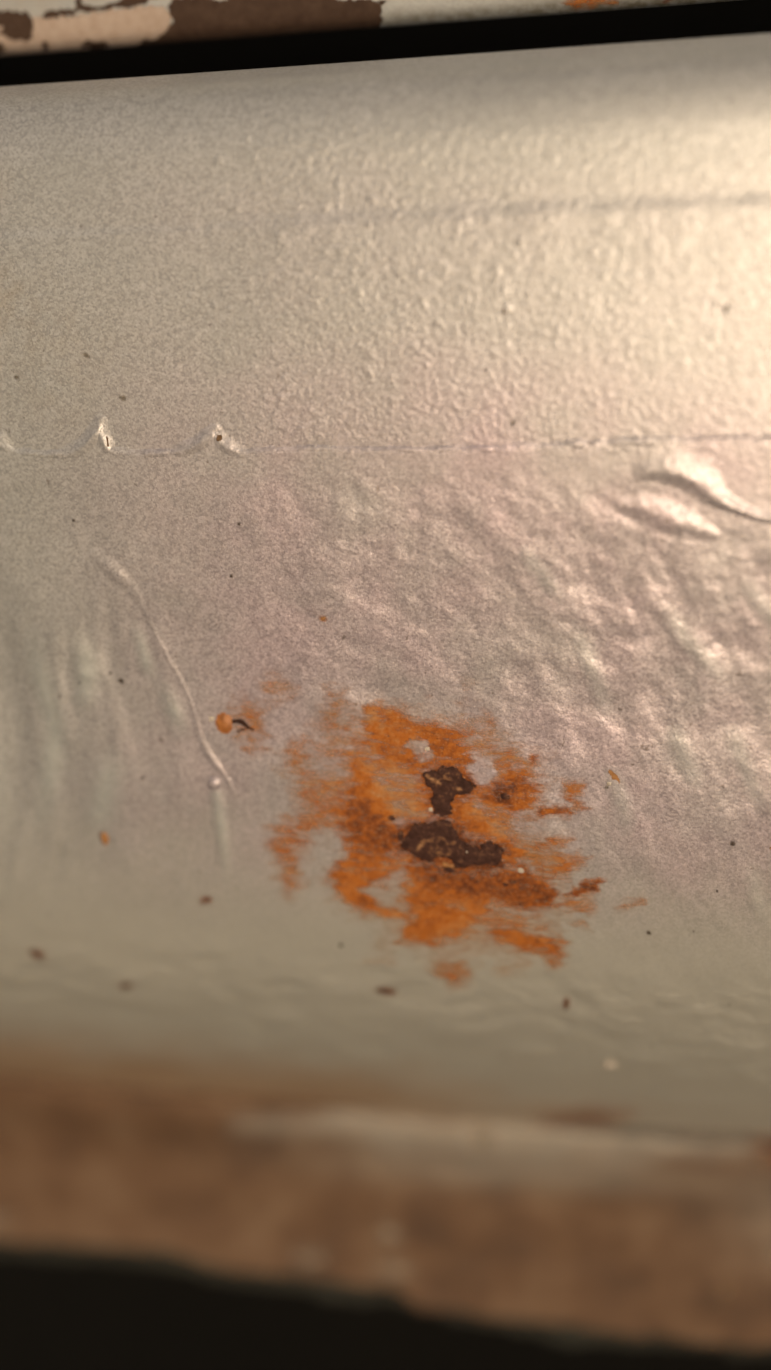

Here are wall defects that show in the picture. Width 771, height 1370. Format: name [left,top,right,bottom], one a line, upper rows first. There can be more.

peeling [0,0,386,56]
corrosion [272,700,605,968]